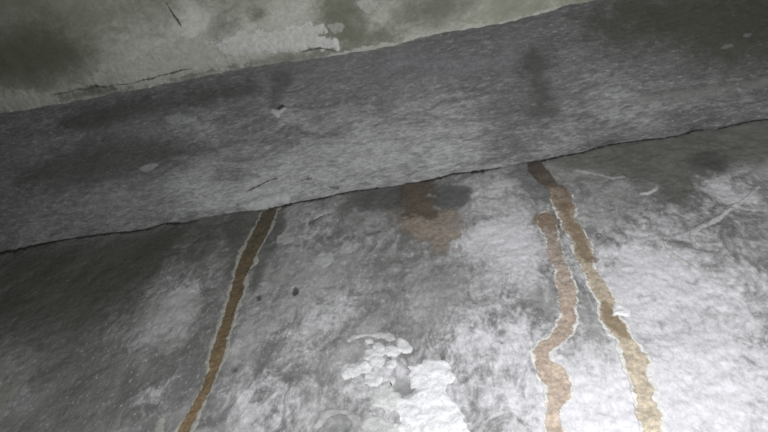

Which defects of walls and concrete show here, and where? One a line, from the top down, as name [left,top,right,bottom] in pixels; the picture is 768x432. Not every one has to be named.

corrosion [397,179,461,255]